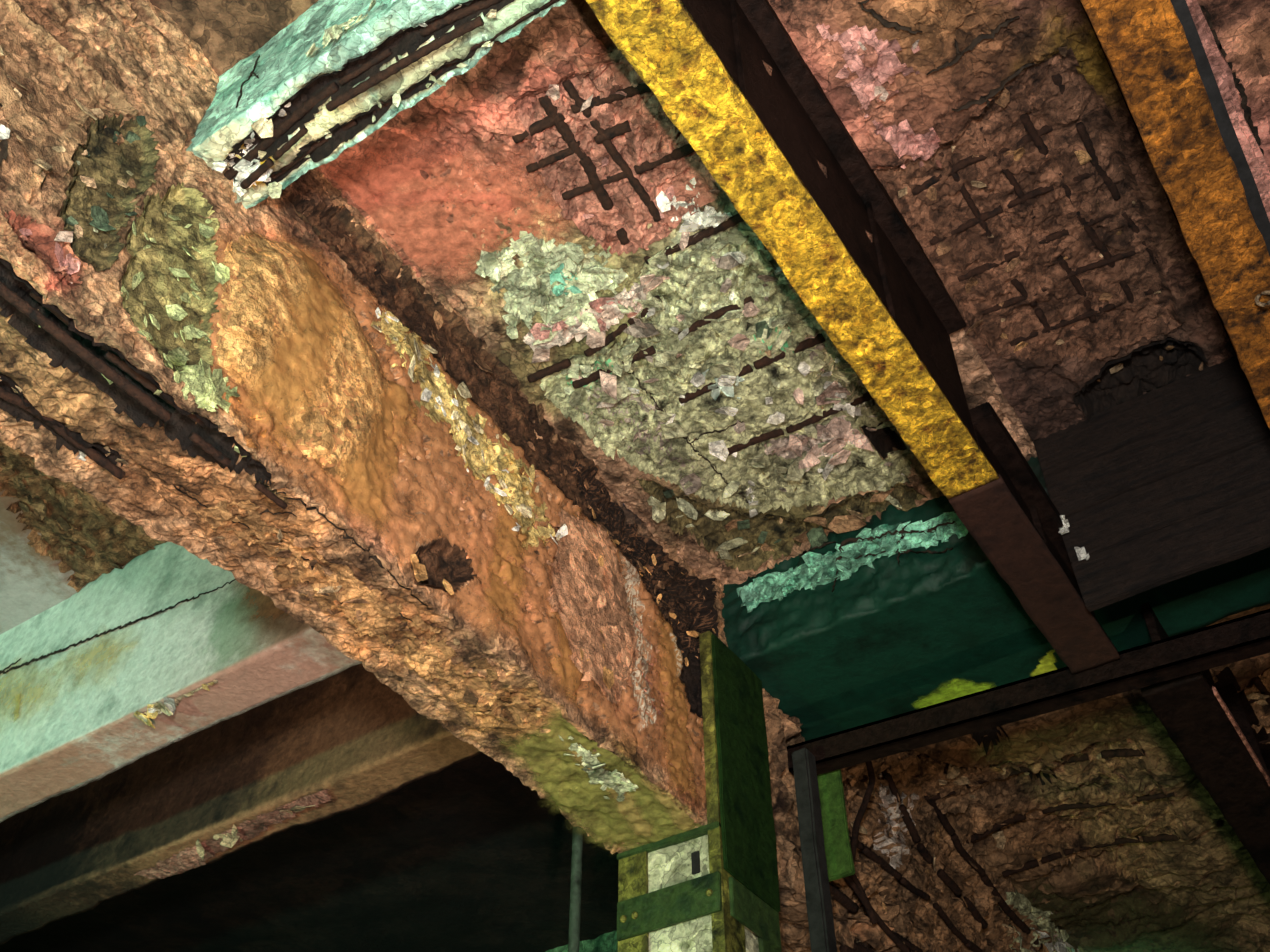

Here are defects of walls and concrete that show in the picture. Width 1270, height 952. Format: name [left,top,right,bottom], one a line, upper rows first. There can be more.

spalling [0,0,288,509]
corrosion [327,152,560,272]
corrosion [249,255,342,439]
spalling [212,0,968,719]
spalling [0,441,168,593]
crack [0,579,236,674]
corrosion [341,378,417,519]
corrosion [486,487,535,625]
peeling [134,789,332,879]
peeling [559,736,639,802]
corrosion [658,617,691,789]
spalling [829,738,1196,952]